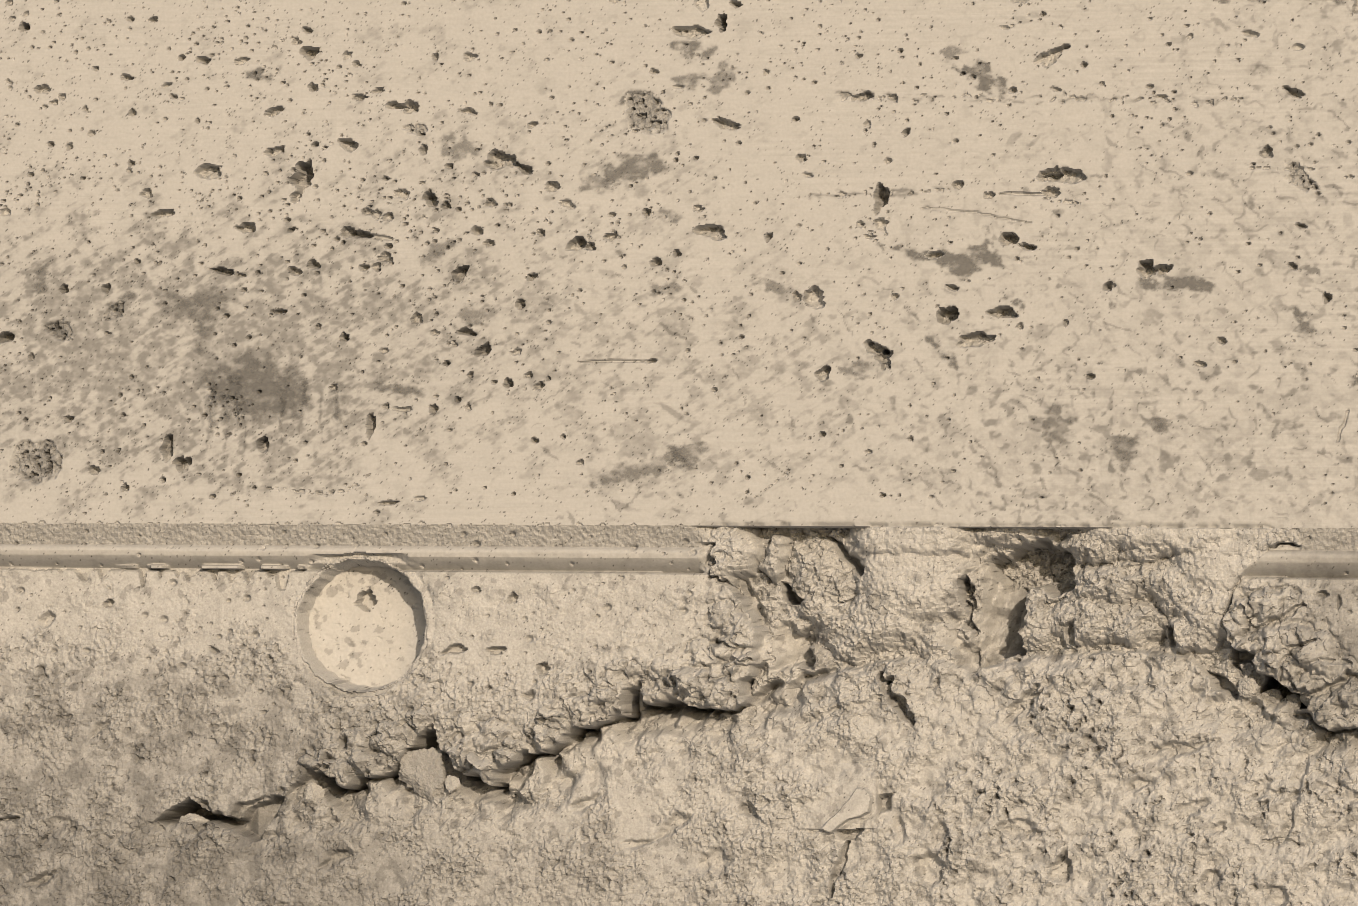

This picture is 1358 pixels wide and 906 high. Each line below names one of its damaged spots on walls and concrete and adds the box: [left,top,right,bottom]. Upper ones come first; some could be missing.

spalling [695,527,1300,698]
crack [314,678,754,797]
crack [1203,596,1358,846]
crack [155,796,285,842]
crack [827,840,851,899]